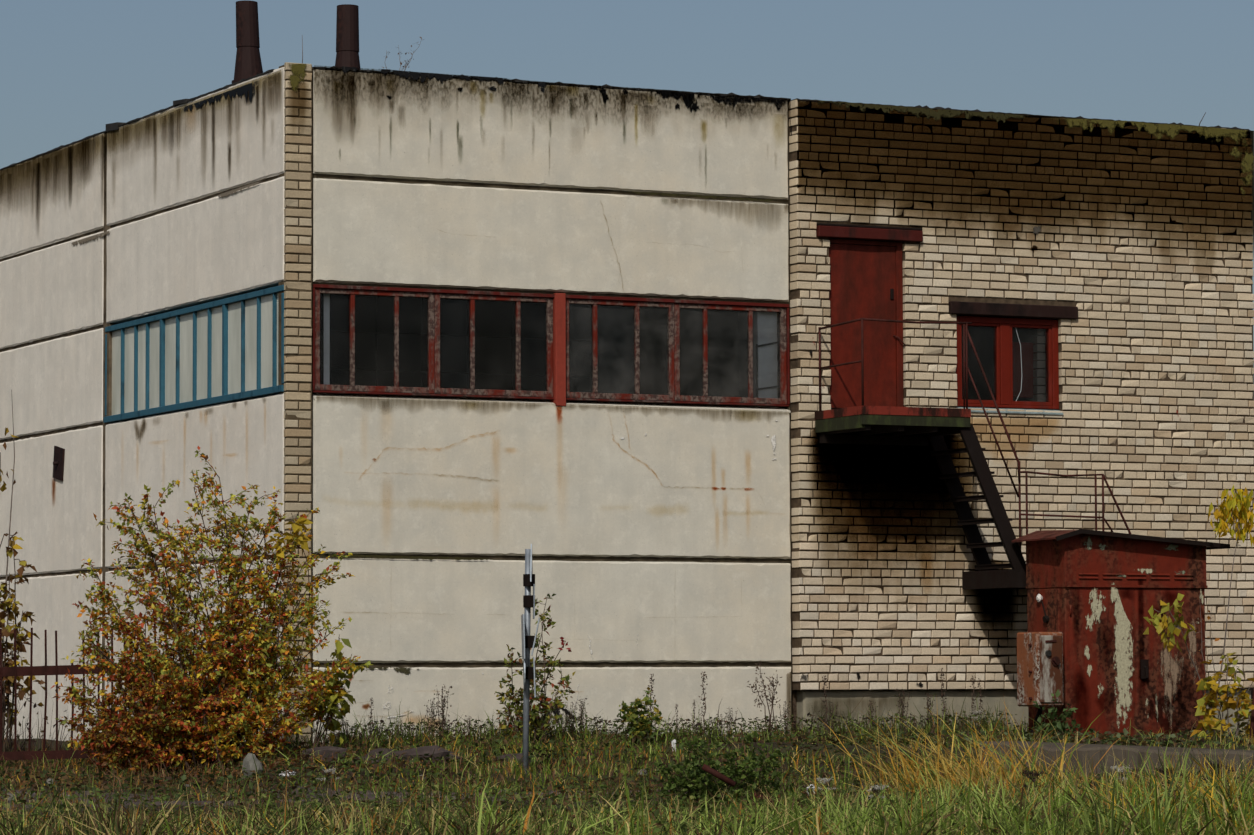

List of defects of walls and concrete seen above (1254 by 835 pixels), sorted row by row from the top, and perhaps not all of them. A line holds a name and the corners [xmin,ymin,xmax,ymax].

leakage [1,128,128,215]
leakage [203,96,231,167]
leakage [293,66,1254,250]
peeling [1084,569,1198,733]